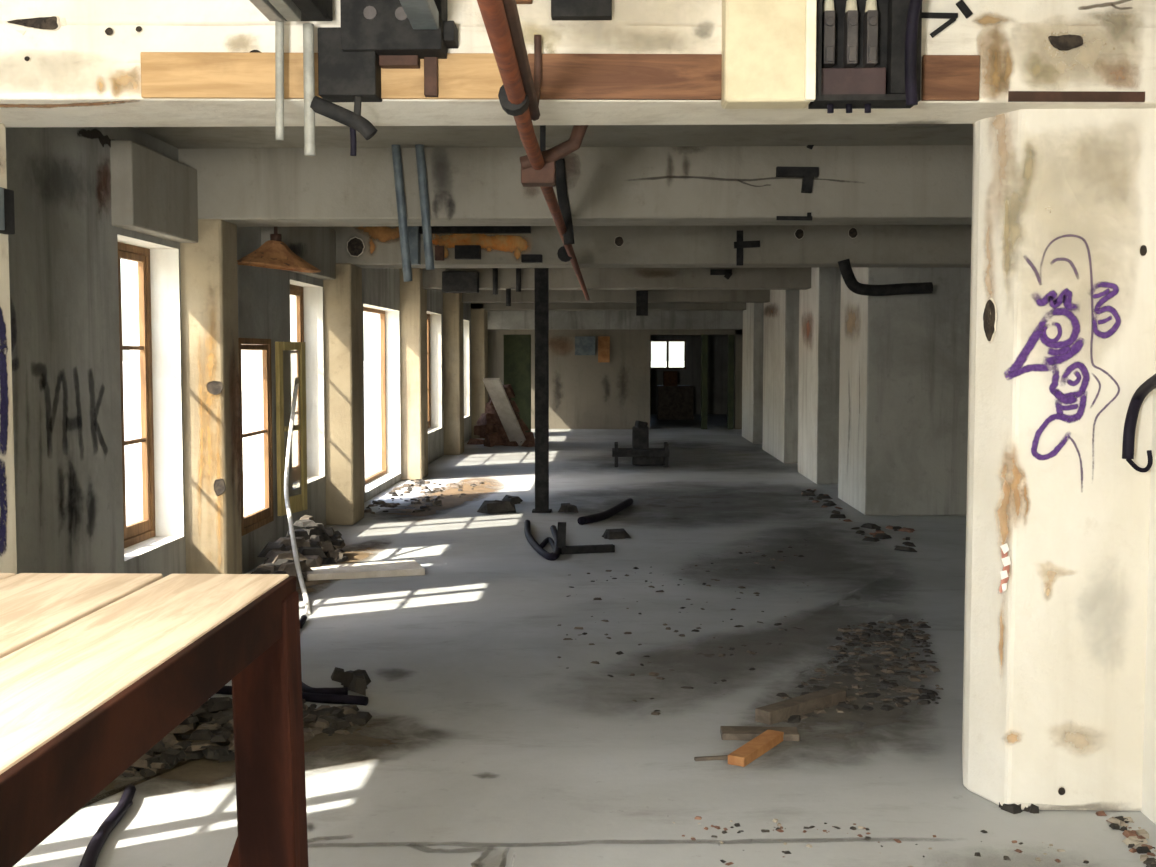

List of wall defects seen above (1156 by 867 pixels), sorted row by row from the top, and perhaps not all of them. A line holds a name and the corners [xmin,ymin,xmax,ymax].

damp [1032,12,1128,84]
peeling [999,543,1011,593]
crack [308,836,900,867]